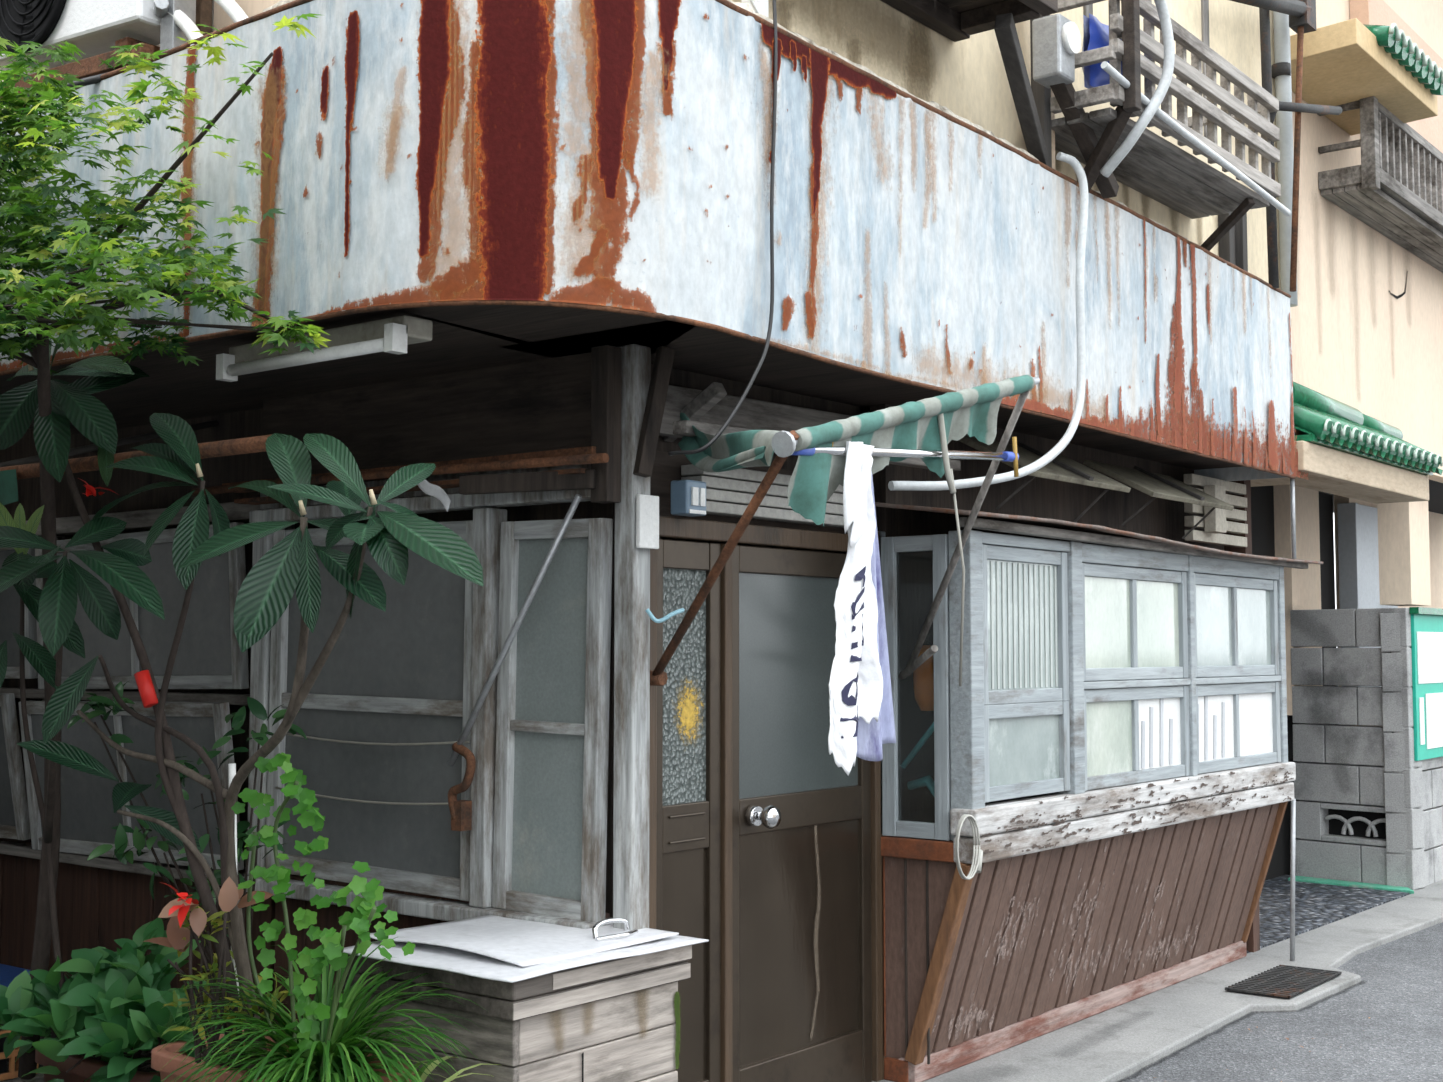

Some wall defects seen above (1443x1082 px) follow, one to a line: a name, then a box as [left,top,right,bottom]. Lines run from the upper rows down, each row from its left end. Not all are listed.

rust [251,46,298,326]
rust [316,0,682,315]
rust [761,23,897,339]
rust [938,319,952,374]
rust [1001,219,1308,479]
peeling [982,868,1201,994]
peeling [980,768,1294,854]